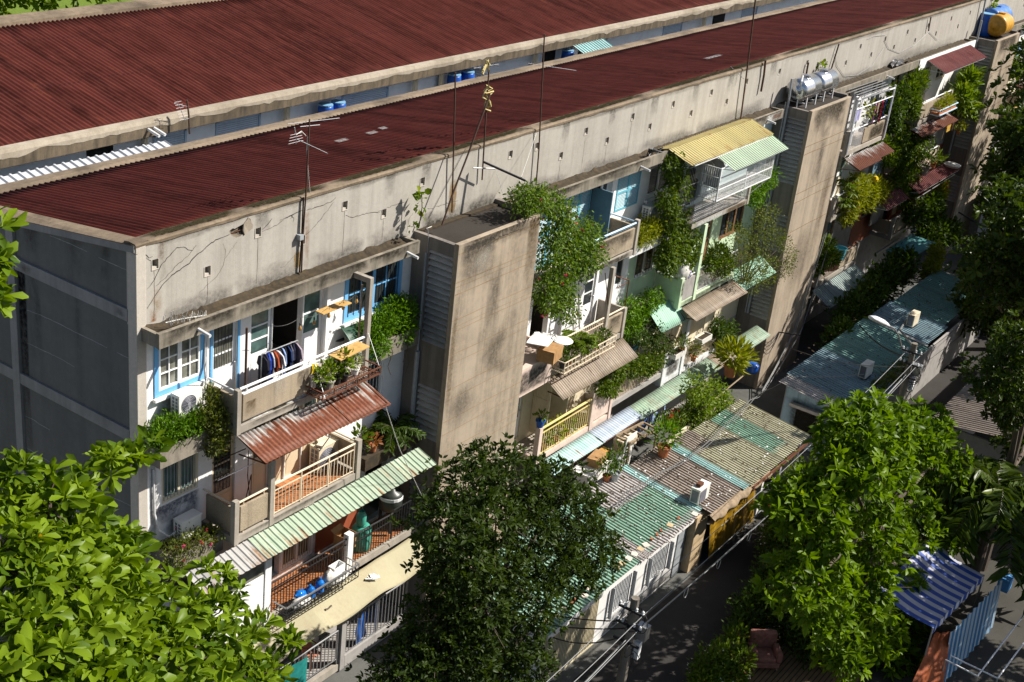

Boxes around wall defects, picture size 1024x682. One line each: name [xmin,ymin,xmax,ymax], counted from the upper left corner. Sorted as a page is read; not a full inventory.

crack [51,201,455,310]
damp [455,217,540,296]
damp [443,286,546,436]